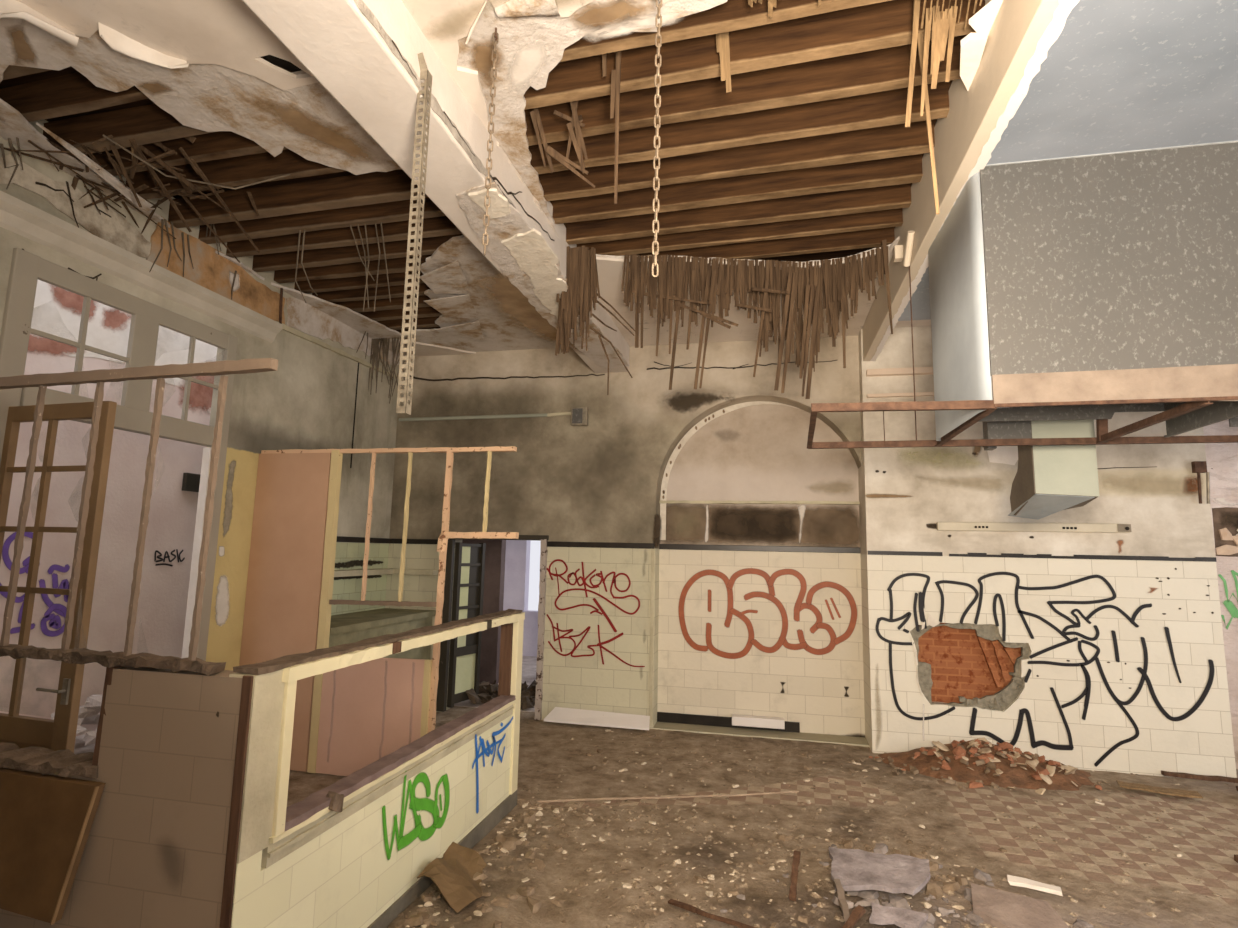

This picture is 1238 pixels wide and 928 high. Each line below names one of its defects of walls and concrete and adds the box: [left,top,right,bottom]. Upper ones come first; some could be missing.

spalling [934,0,1080,240]
flaking render [0,0,727,369]
spalling [870,254,929,362]
peeling [155,325,217,413]
flaking render [1212,507,1238,557]
spalling [910,608,1039,711]